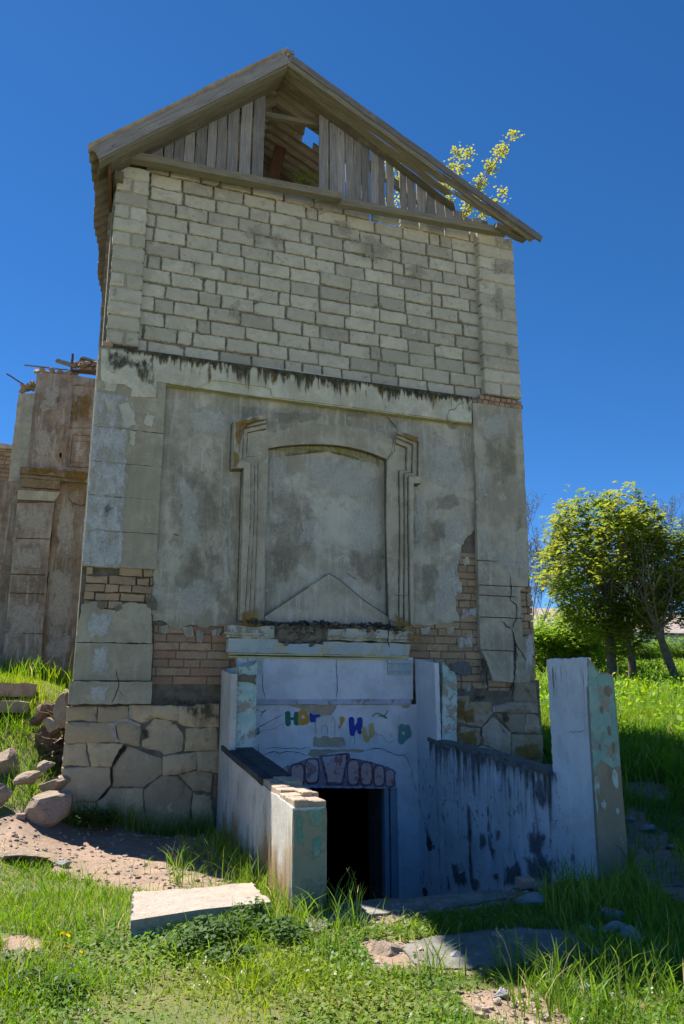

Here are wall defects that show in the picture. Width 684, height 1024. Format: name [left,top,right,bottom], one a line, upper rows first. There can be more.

damp [272,375,452,409]
peeling [18,356,154,567]
peeling [88,600,122,673]
crack [502,572,526,697]
crack [97,745,126,801]
damp [429,742,557,821]
peeling [588,660,620,815]
damp [447,806,500,891]
damp [493,831,551,885]